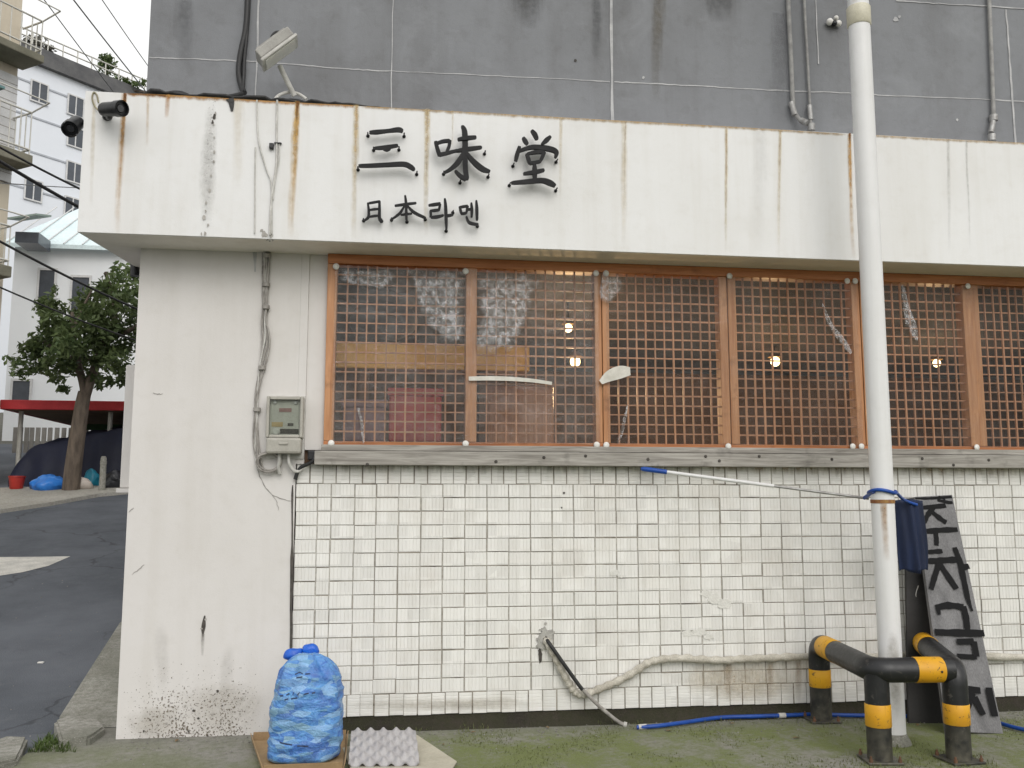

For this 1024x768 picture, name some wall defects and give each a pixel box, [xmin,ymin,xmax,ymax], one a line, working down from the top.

corrosion [123,93,851,187]
damp [121,667,255,738]